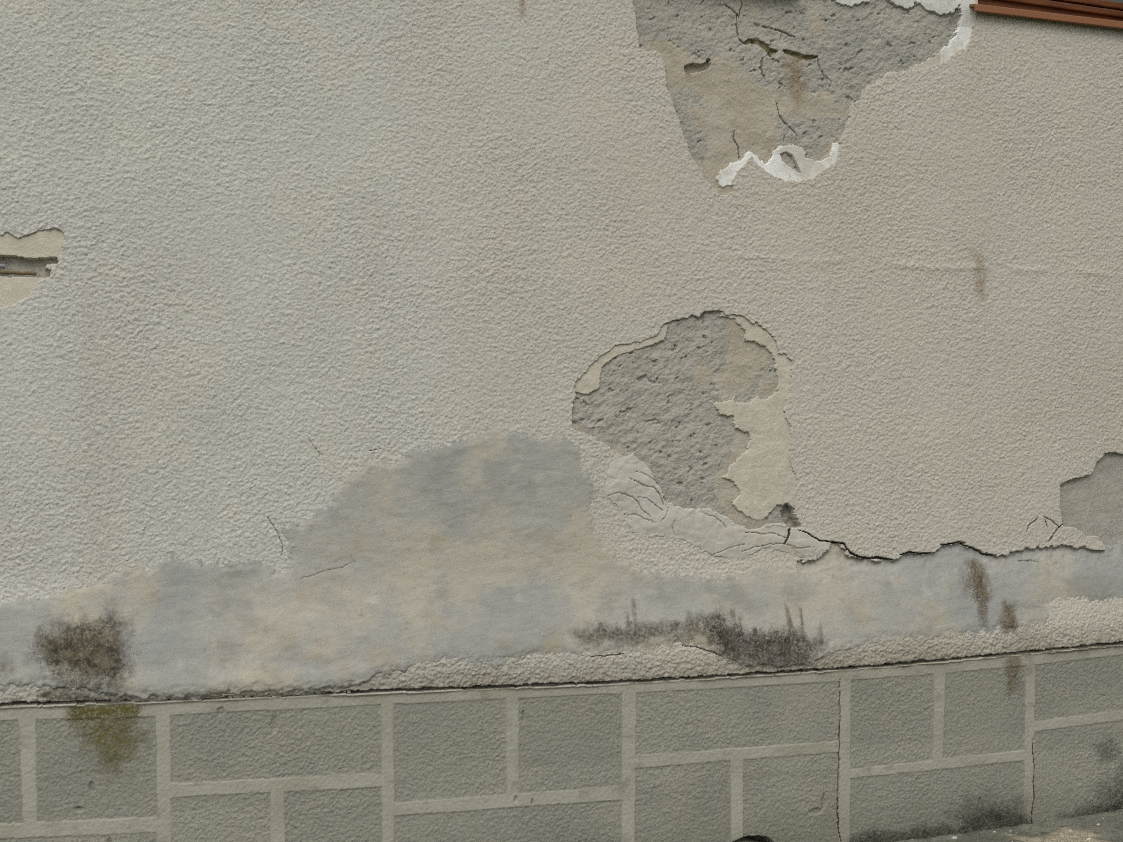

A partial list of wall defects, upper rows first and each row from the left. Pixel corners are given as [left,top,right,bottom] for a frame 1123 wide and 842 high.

spalling [633,0,975,195]
spalling [0,228,65,308]
spalling [572,310,831,560]
crack [708,515,993,560]
spalling [1060,452,1123,547]
leakage [579,615,822,663]
leakage [39,615,140,762]